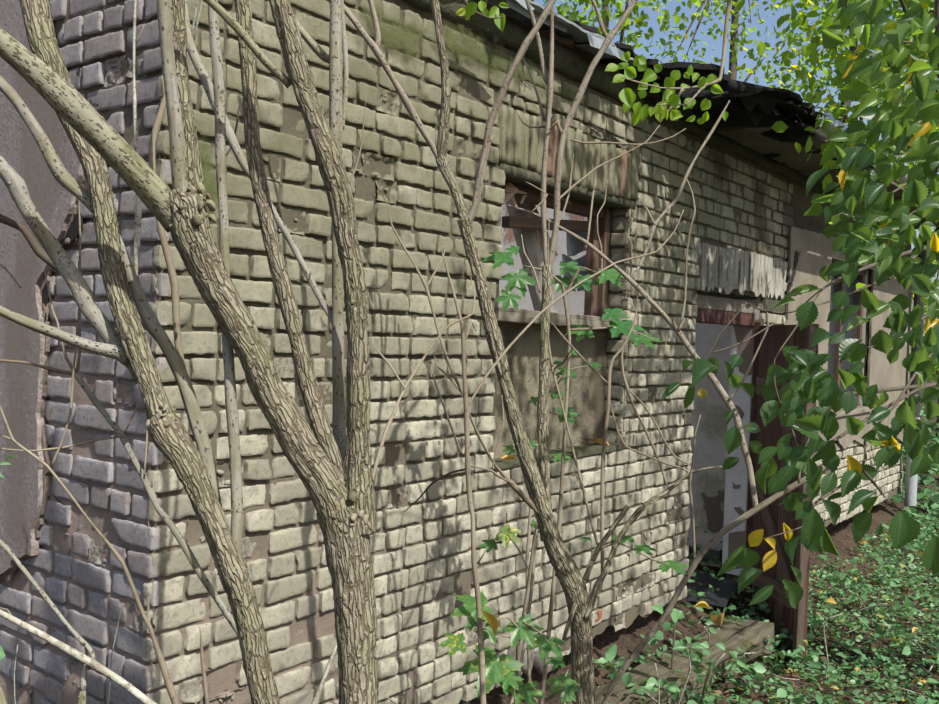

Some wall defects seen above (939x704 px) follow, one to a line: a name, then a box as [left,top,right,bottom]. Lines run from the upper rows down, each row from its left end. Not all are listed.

peeling [733,319,765,375]
peeling [701,482,746,556]